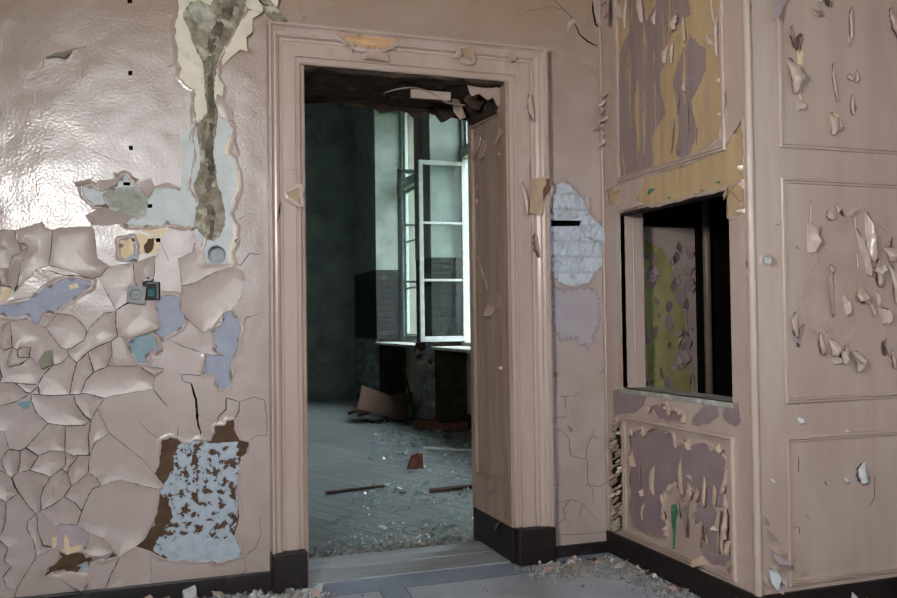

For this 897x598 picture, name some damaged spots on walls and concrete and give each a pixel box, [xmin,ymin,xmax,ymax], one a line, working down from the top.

crack [519,0,597,46]
peeling [592,0,746,220]
peeling [785,25,807,111]
peeling [277,183,305,223]
peeling [521,161,605,290]
peeling [0,0,287,598]
peeling [791,199,897,373]
peeling [414,342,432,370]
peeling [605,236,751,571]
peeling [843,463,875,506]
flaking render [211,583,323,598]
peeling [762,516,792,595]